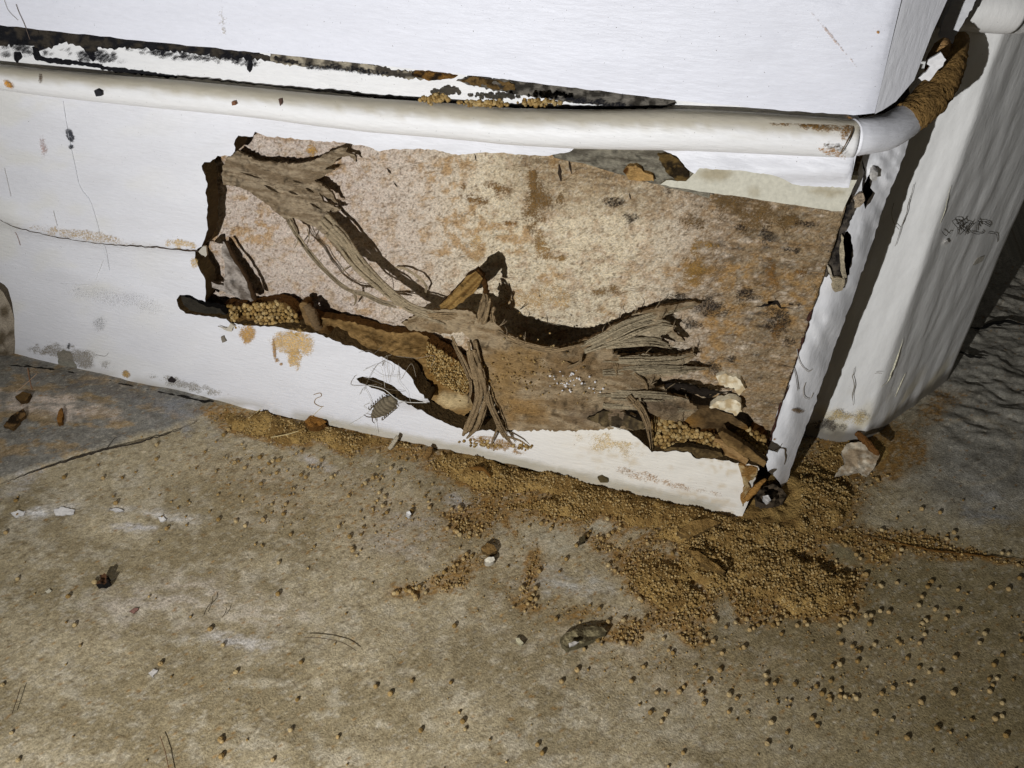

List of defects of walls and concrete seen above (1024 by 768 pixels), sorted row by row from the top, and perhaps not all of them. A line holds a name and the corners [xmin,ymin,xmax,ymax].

peeling [456,76,675,107]
peeling [824,192,865,292]
crack [10,365,74,373]
crack [1,380,214,484]